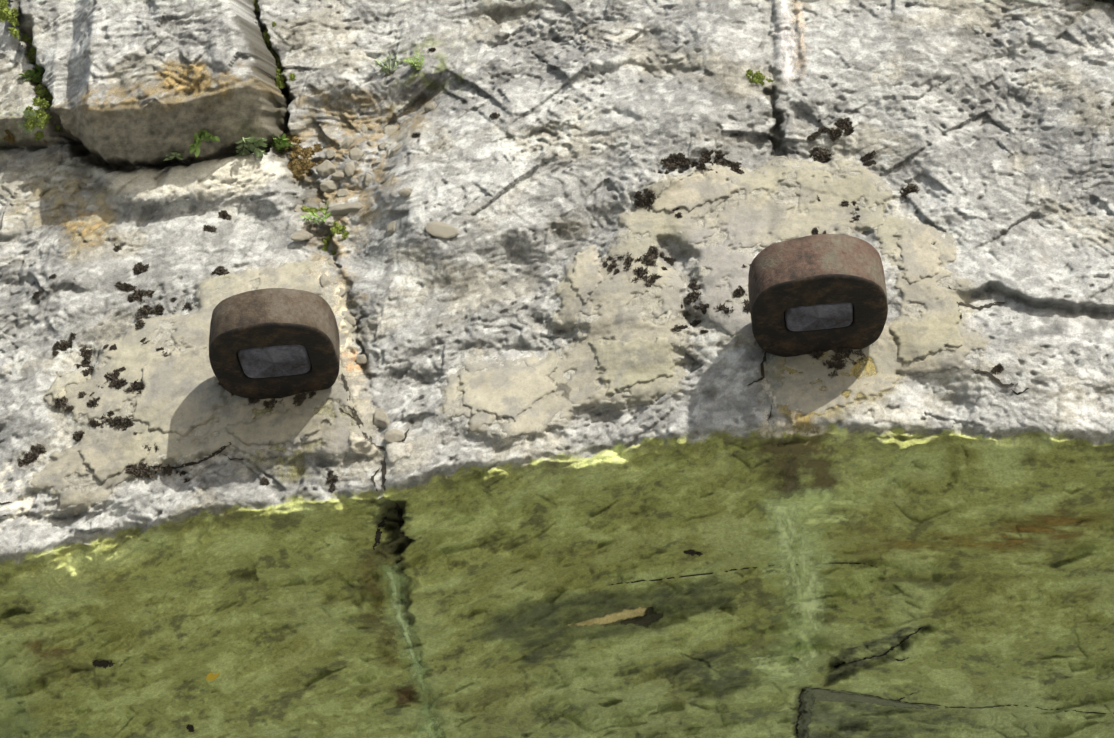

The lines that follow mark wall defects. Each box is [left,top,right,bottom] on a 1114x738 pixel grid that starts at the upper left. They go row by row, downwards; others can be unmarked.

crack [330,371,411,550]
leakage [750,384,871,685]
leakage [383,566,443,738]
crack [795,626,1114,738]